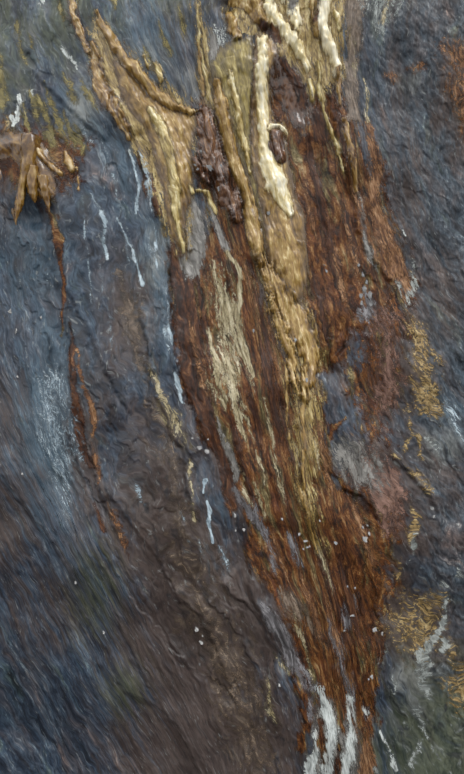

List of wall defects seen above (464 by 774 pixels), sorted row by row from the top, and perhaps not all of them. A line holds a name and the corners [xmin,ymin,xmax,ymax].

damp [9,80,94,155]
damp [32,366,83,518]
rust [112,268,281,774]
damp [61,0,390,591]
rust [166,0,464,774]
damp [358,0,412,46]